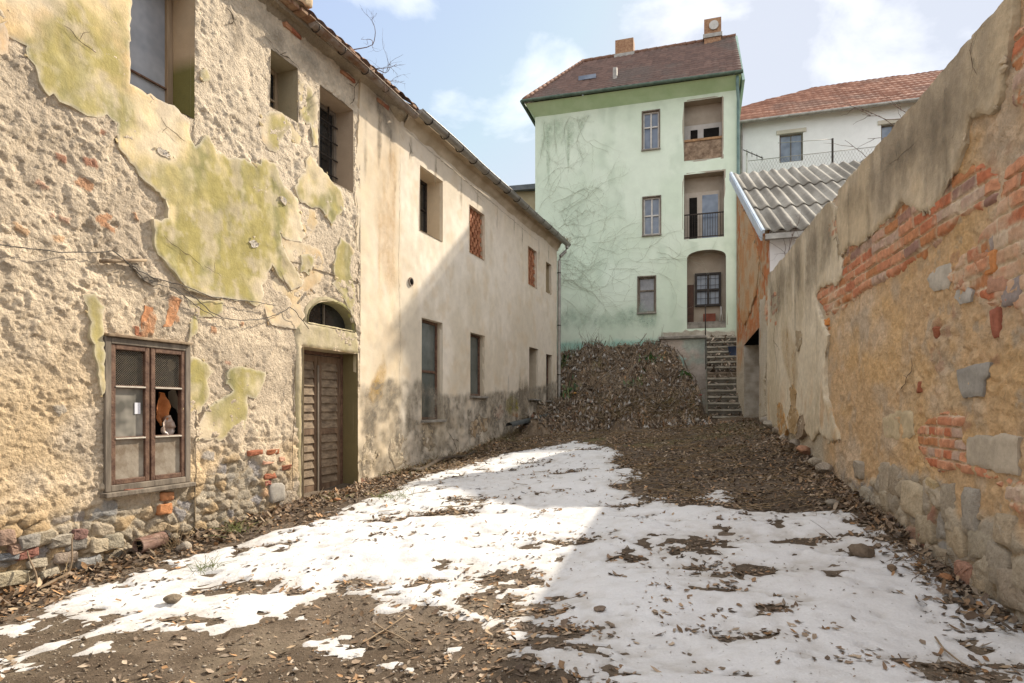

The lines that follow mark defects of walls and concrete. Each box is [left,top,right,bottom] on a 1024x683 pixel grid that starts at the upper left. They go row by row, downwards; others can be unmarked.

flaking render [0,0,361,591]
water stain [361,380,556,475]
flaking render [663,0,1024,444]
flaking render [917,411,1024,514]